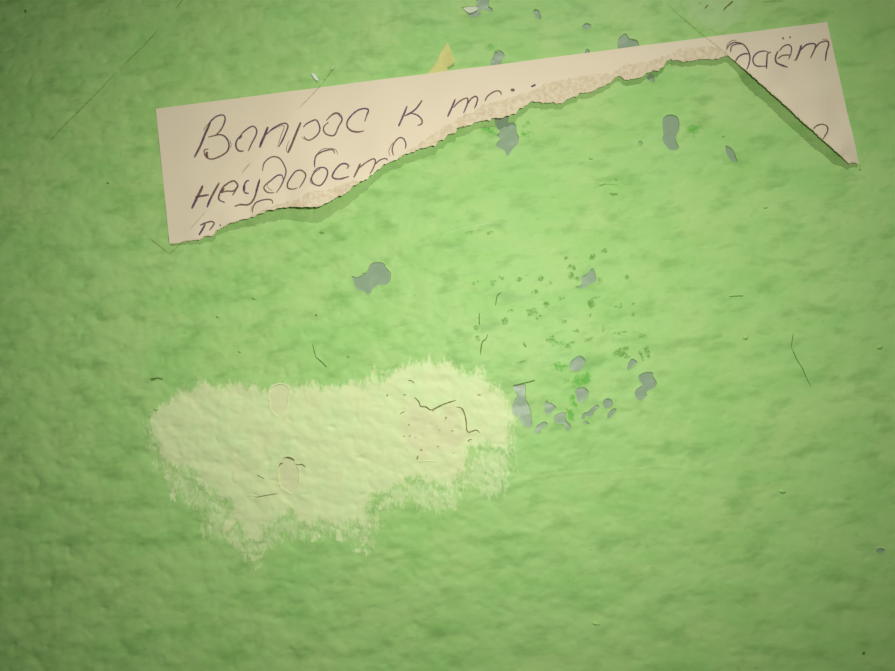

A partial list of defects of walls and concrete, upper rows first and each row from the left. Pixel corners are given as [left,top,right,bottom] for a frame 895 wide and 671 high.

peeling [460,0,494,19]
peeling [616,32,640,49]
peeling [493,116,520,157]
peeling [661,113,681,152]
peeling [349,261,392,296]
peeling [626,357,658,403]
peeling [141,352,618,572]